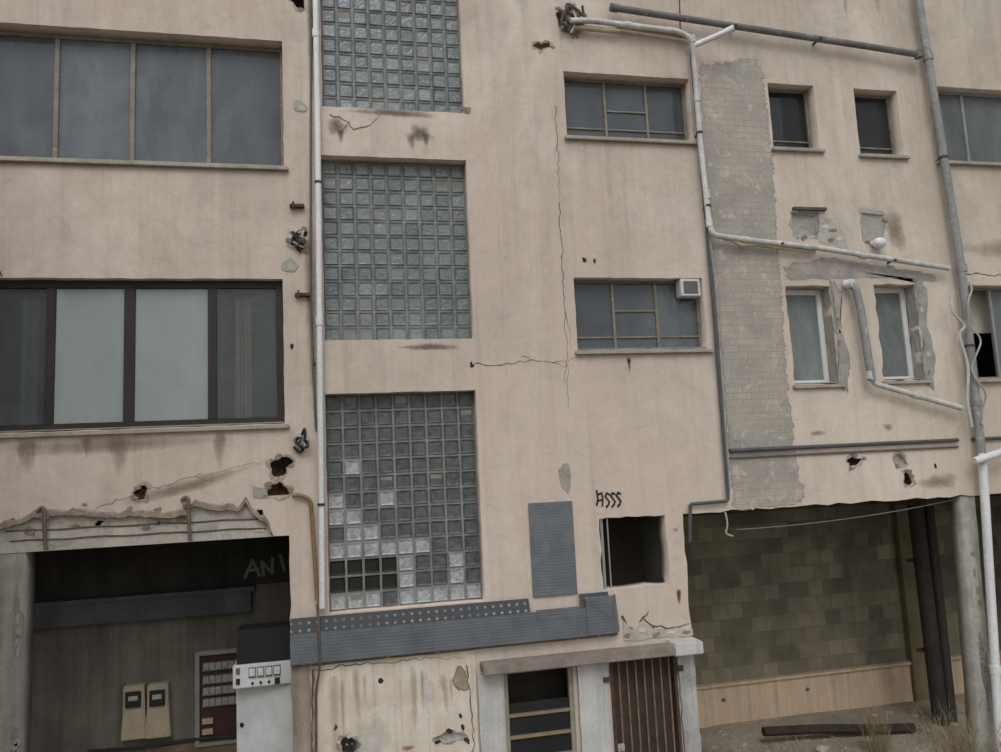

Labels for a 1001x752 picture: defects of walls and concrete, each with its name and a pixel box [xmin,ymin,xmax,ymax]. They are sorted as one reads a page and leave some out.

crack [330,114,380,130]
crack [475,106,572,400]
peeling [783,212,936,392]
spalling [263,453,296,501]
hole [846,453,866,471]
spalling [892,451,917,488]
spalling [3,481,266,542]
spalling [334,724,362,752]
spalling [432,713,470,745]